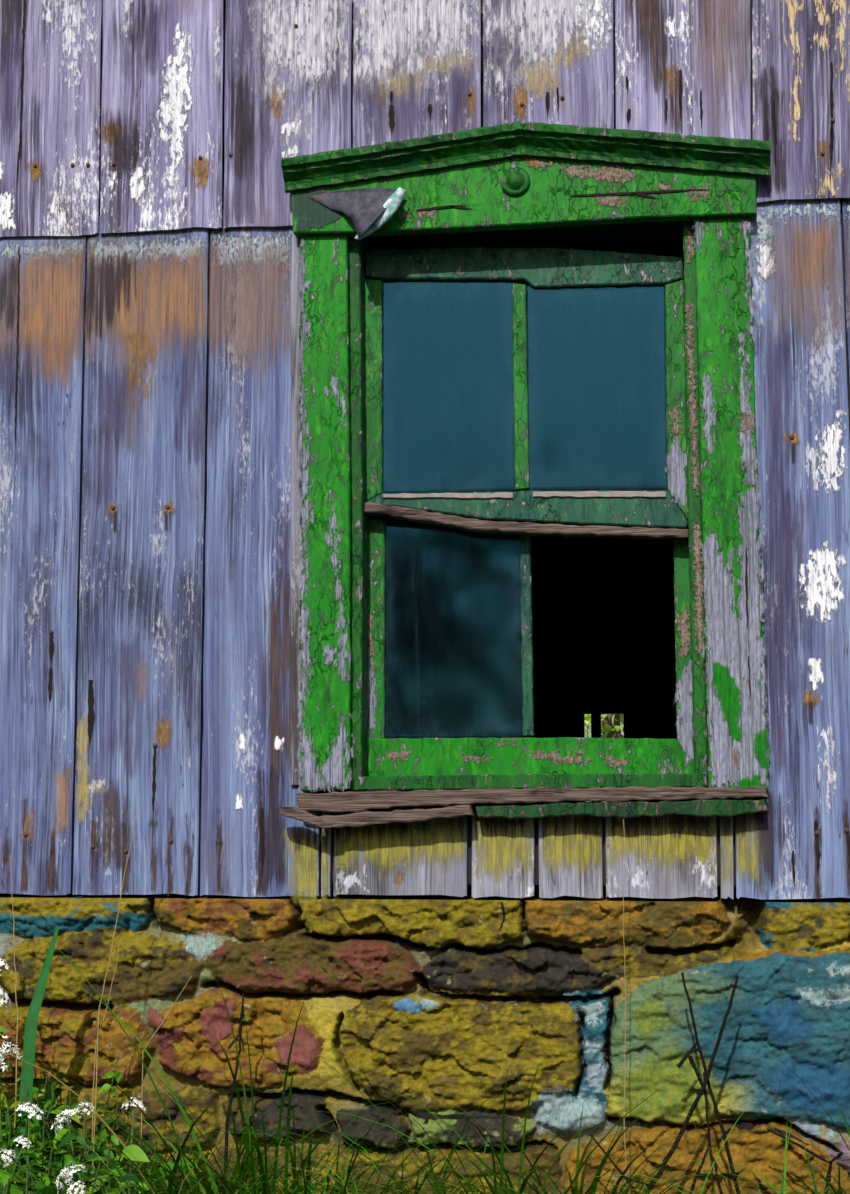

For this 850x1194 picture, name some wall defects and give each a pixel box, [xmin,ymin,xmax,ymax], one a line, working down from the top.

peeling [119,0,133,37]
peeling [38,0,100,110]
peeling [781,0,850,144]
peeling [52,161,74,206]
peeling [108,163,145,206]
peeling [519,157,637,209]
corrosion [0,253,278,395]
peeling [0,187,437,794]
peeling [665,162,850,788]
peeling [462,738,519,765]
peeling [532,745,631,769]